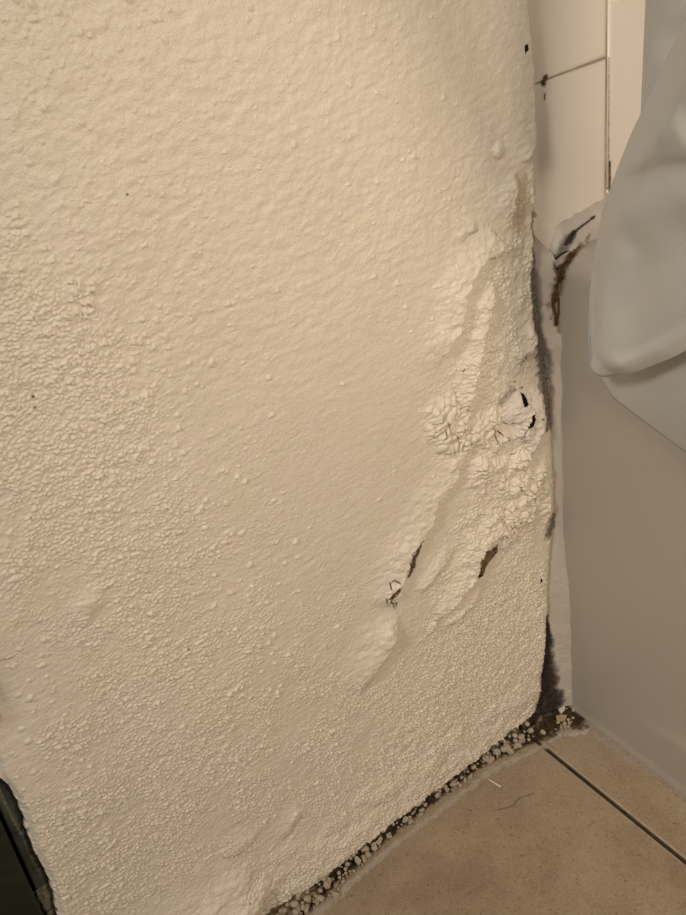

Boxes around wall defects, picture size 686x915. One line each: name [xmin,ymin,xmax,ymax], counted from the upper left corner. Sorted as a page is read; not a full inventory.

rust [548,243,584,333]
peeling [368,386,553,635]
flaking render [276,708,577,915]